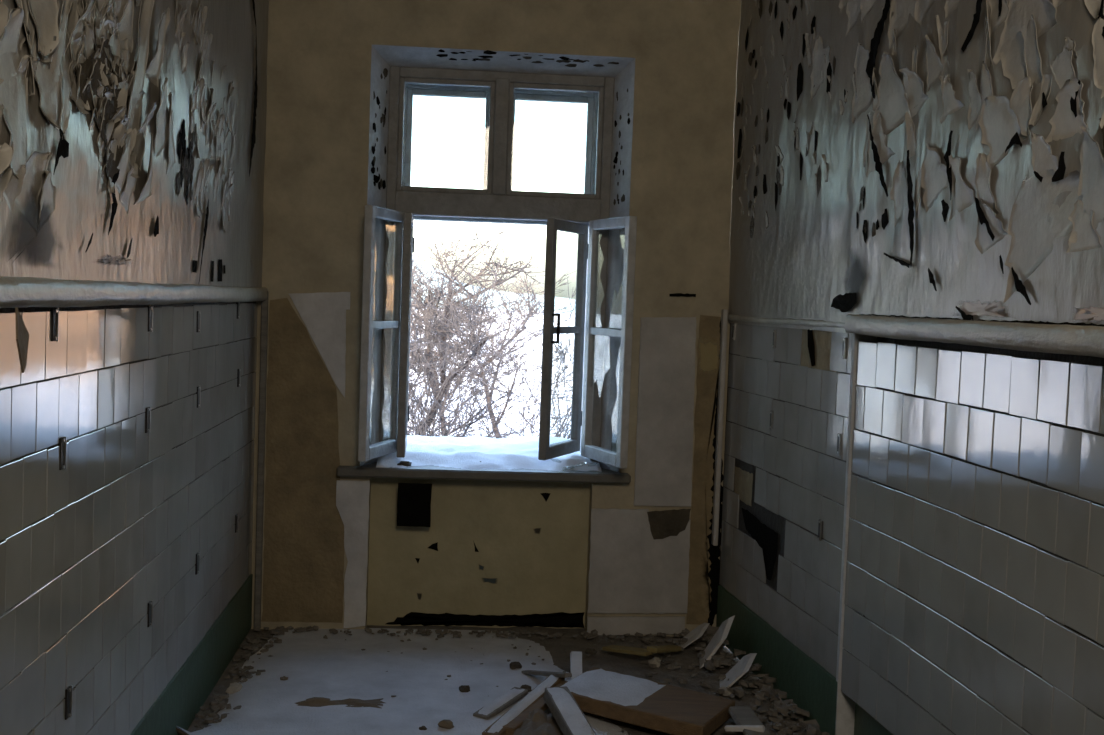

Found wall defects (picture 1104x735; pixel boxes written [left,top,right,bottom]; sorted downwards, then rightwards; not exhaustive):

peeling [0,0,236,232]
crack [249,0,258,176]
peeling [371,68,388,190]
peeling [436,49,619,67]
peeling [736,0,1104,304]
spalling [831,292,857,312]
peeling [742,508,778,580]